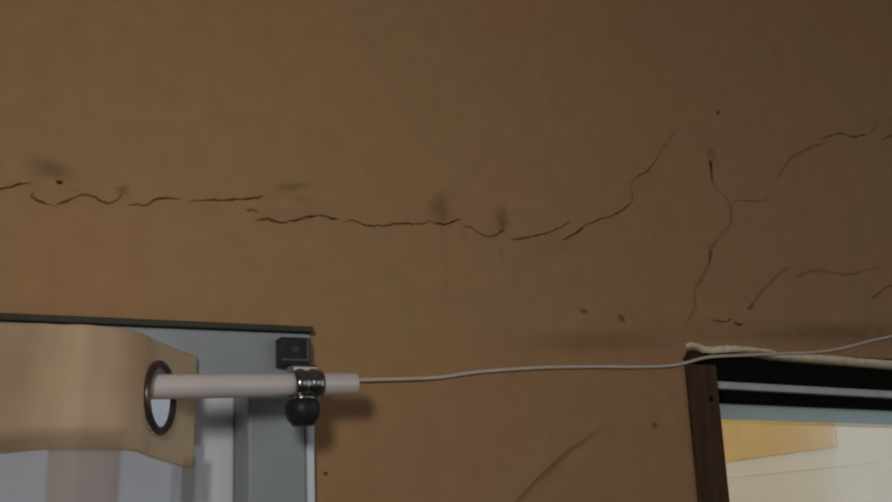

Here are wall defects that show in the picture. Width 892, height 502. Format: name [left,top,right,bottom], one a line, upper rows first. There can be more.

crack [0,183,44,203]
crack [67,194,261,206]
crack [260,205,628,239]